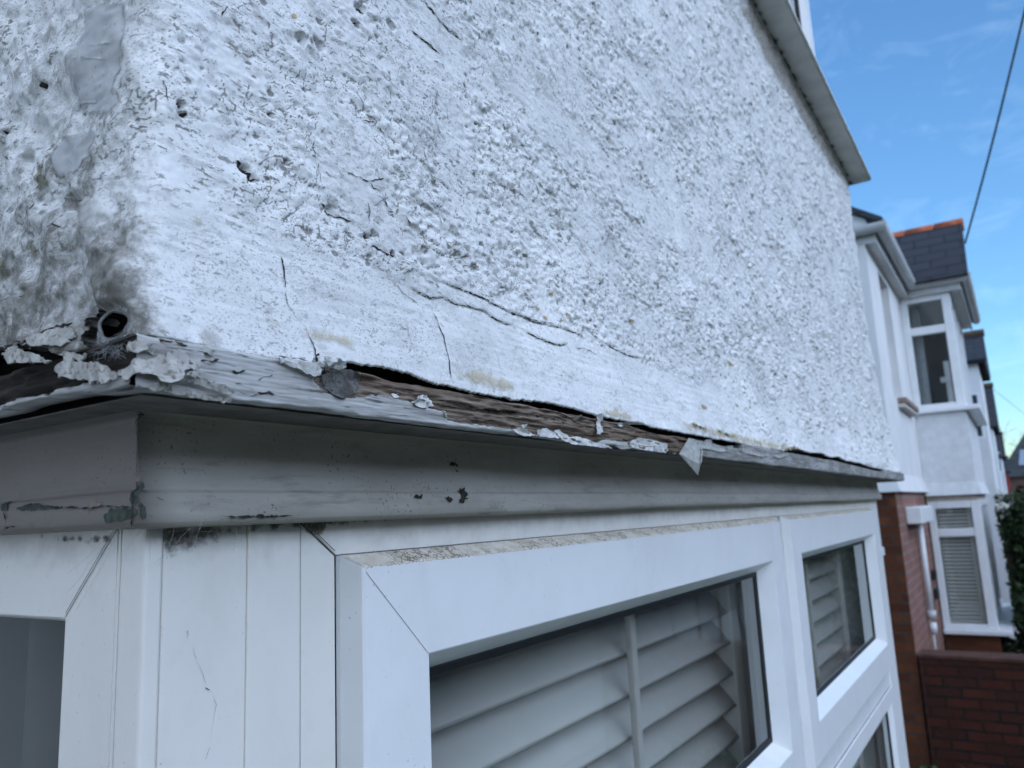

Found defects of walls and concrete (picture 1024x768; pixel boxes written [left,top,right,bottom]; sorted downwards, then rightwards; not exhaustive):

crack [313,140,662,437]
peeling [1,327,236,404]
peeling [278,356,347,377]
peeling [411,395,447,417]
peeling [512,413,790,475]
peeling [0,501,59,511]
peeling [86,472,147,523]